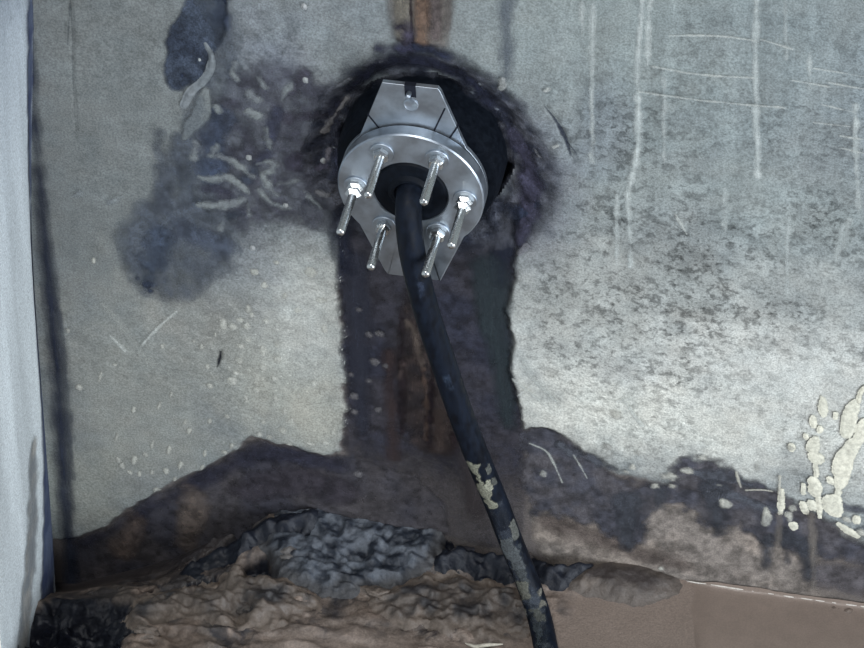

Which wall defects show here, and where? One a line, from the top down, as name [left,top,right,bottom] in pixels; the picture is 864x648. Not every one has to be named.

rust [389,0,451,48]
damp [615,91,642,256]
damp [636,0,651,79]
damp [753,0,761,178]
damp [19,0,484,648]
damp [432,225,864,597]